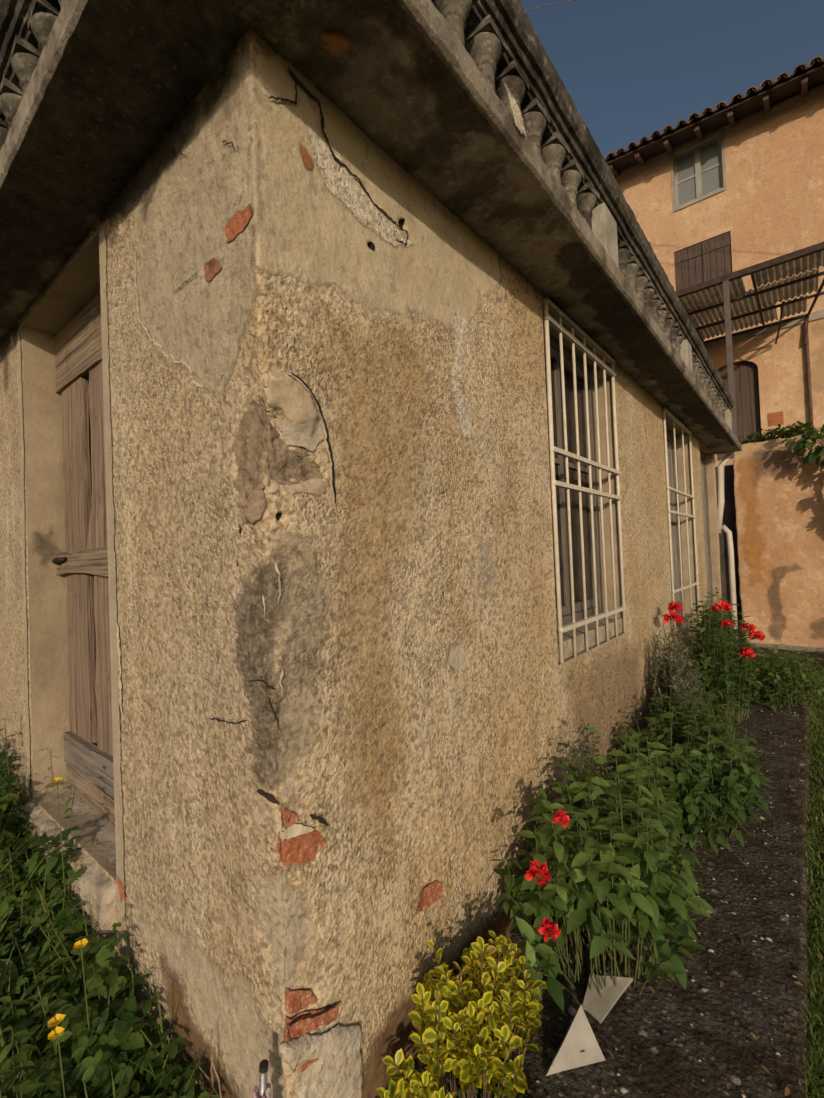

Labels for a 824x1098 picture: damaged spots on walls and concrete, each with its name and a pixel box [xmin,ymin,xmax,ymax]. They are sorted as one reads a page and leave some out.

water stain [326,0,497,138]
water stain [0,0,308,307]
peeling [133,44,501,394]
crack [263,67,413,247]
spalling [232,374,326,534]
water stain [233,558,290,790]
water stain [769,567,786,638]
flaking render [277,807,325,866]
flaking render [418,881,443,912]
spalling [279,988,363,1098]